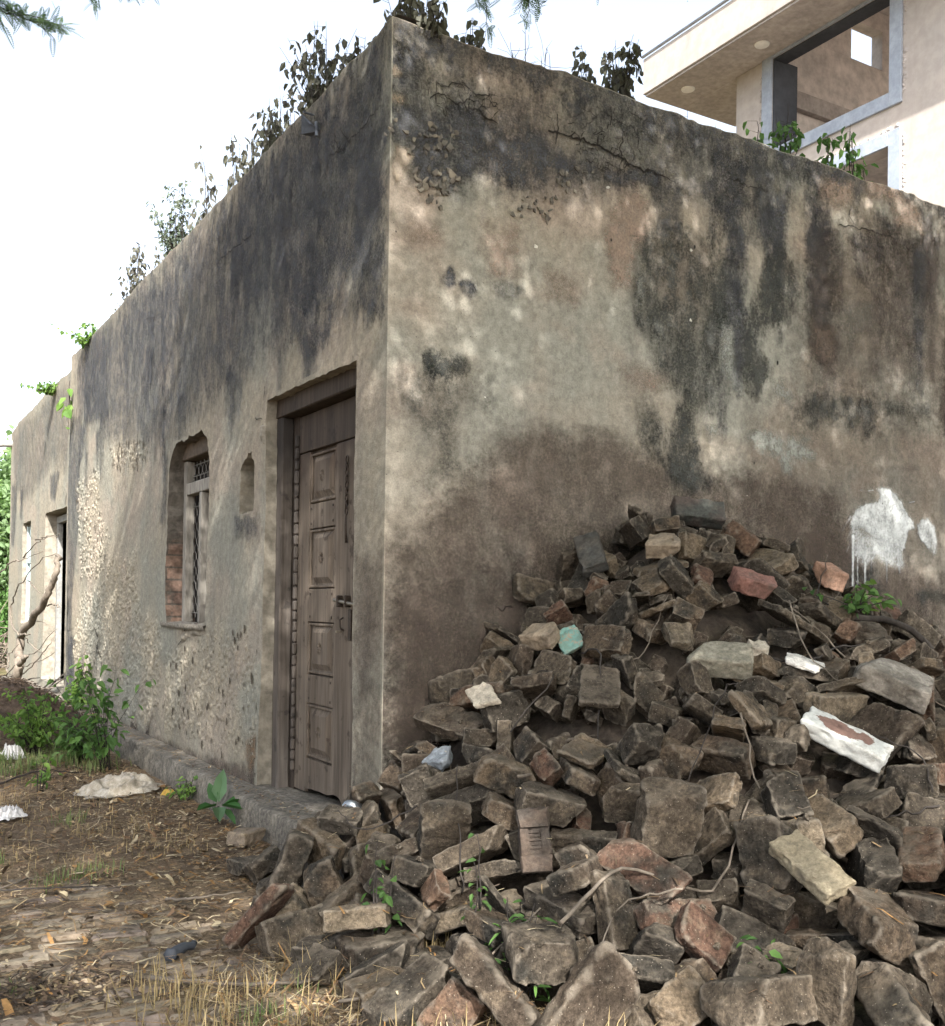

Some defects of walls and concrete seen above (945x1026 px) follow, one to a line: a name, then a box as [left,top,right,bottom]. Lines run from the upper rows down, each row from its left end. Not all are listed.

peeling [384,94,461,211]
crack [426,81,505,124]
crack [548,101,676,183]
peeling [511,166,596,225]
damp [51,18,945,763]
damp [131,718,255,784]